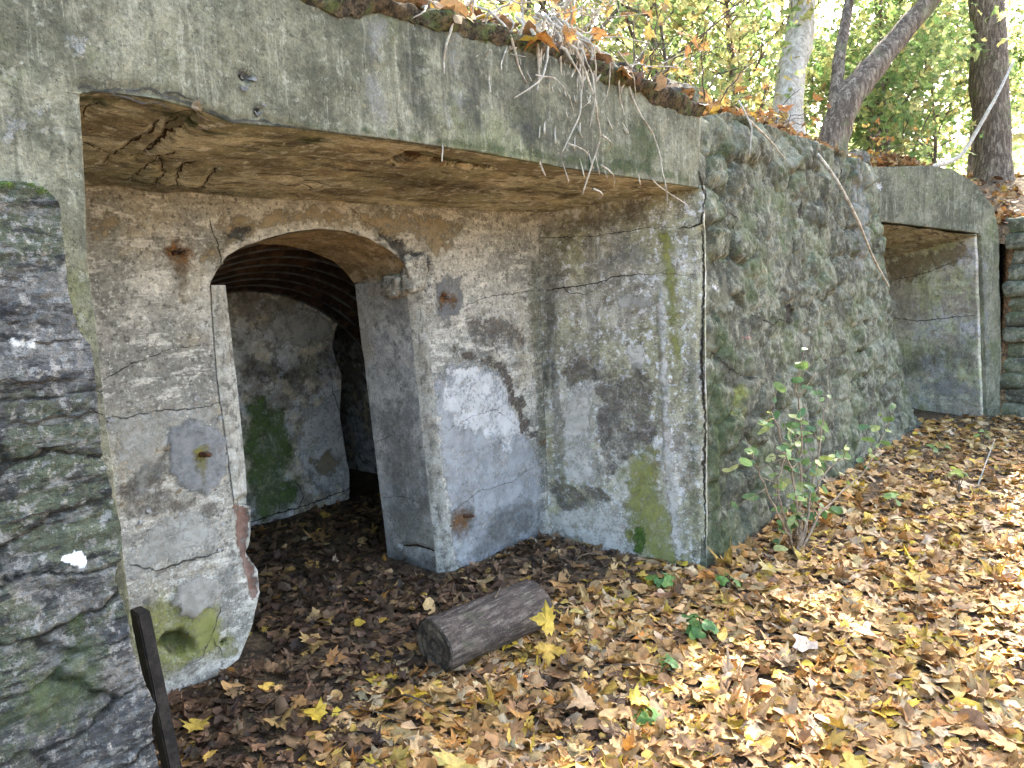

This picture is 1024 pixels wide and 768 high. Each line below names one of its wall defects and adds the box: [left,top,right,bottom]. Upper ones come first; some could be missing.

crack [67,85,306,186]
corrosion [165,240,192,273]
crack [463,170,764,557]
peeling [106,396,258,598]
corrosion [451,511,475,530]